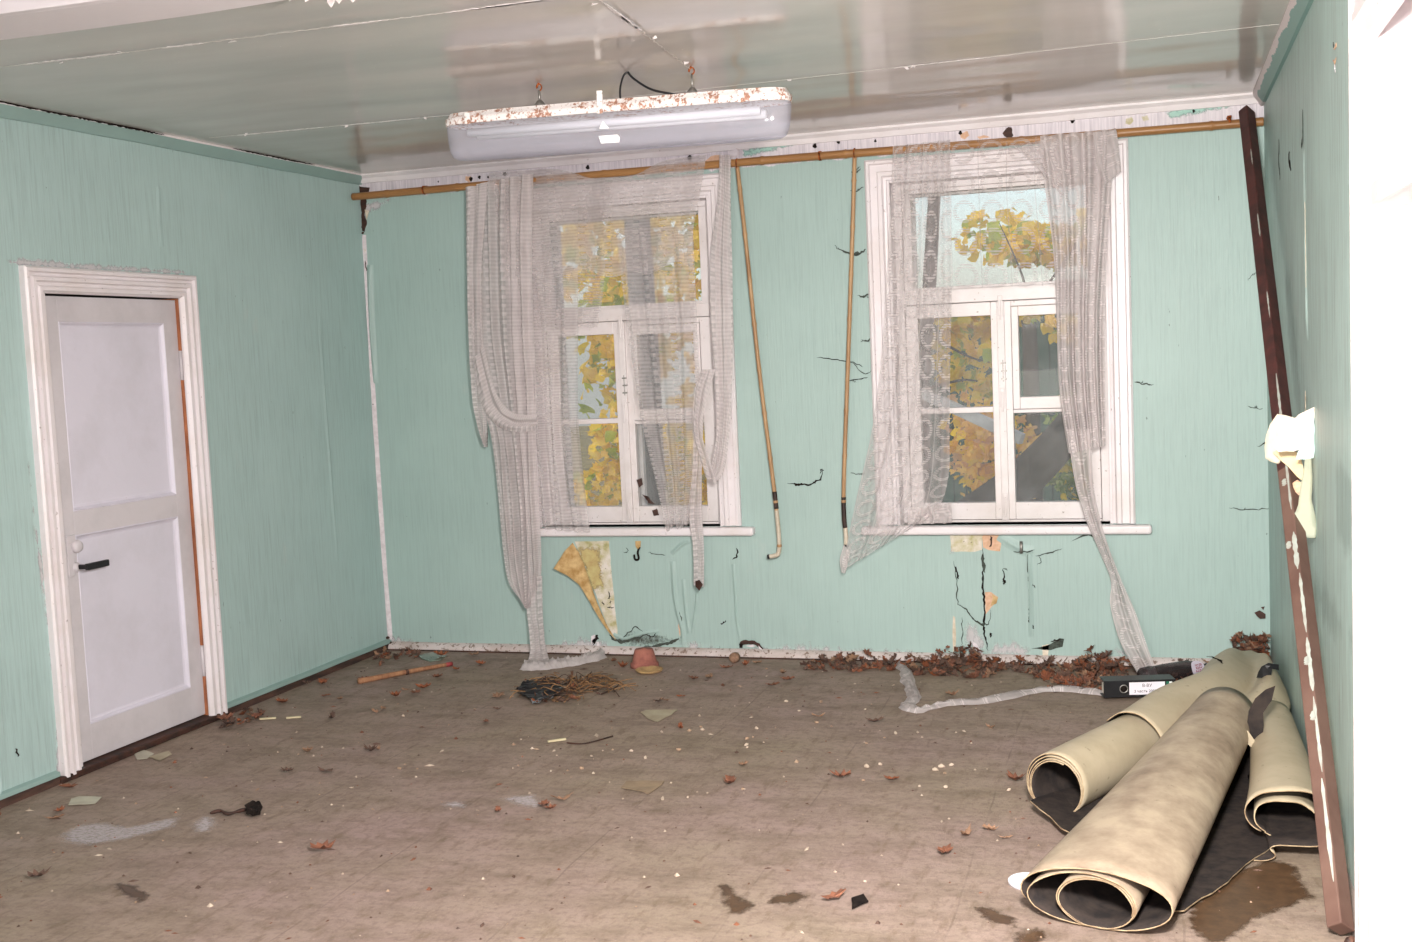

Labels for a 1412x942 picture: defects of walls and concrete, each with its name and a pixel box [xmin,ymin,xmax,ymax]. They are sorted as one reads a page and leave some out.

crack [788,469,824,486]
flaking render [554,541,618,646]
crack [954,549,1061,650]
water stain [1189,861,1314,942]